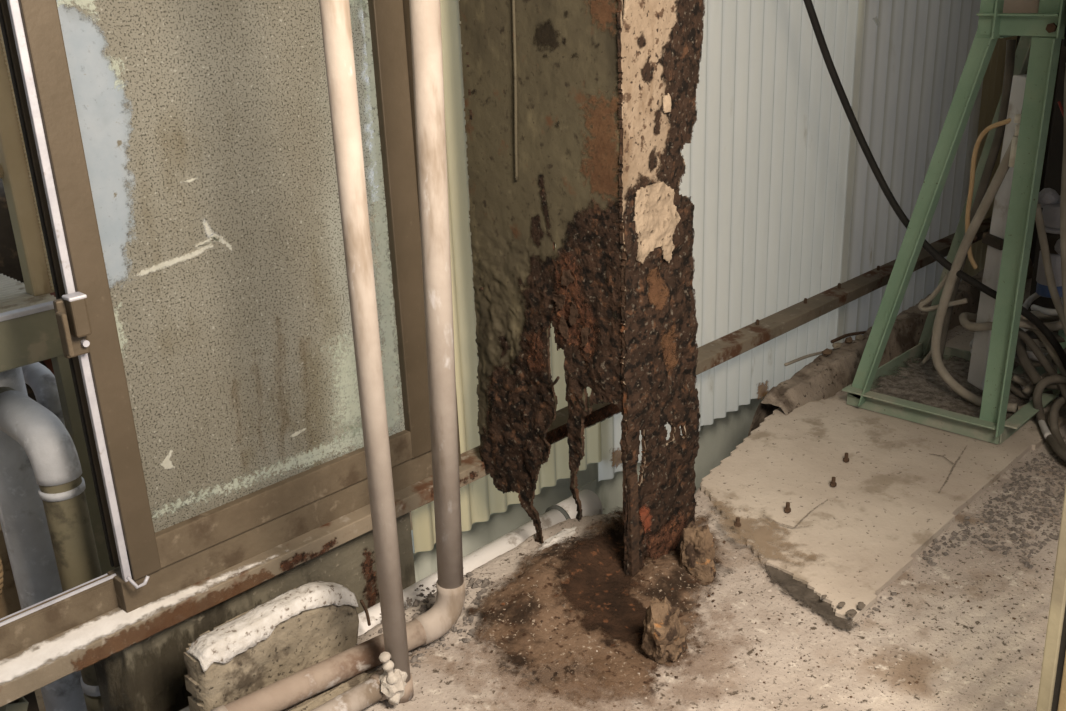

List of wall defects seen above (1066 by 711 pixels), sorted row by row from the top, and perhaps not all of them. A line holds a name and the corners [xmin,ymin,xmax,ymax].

peeling [662,93,671,113]
peeling [634,182,681,264]
corrosion [460,0,705,648]
crack [931,449,965,493]
corrosion [71,538,337,671]
corrosion [361,548,379,607]